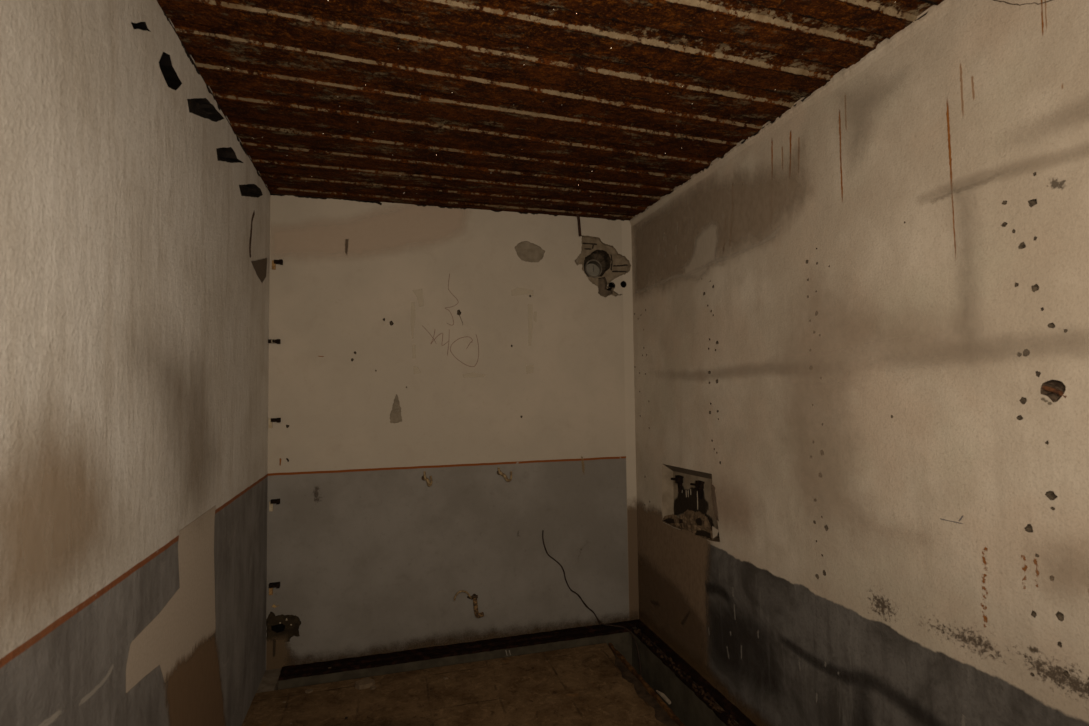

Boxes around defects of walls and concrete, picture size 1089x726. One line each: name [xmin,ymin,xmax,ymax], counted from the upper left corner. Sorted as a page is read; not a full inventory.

crack [993,0,1052,8]
rust [161,8,330,200]
rust [946,103,956,255]
flaking render [515,241,545,263]
flaking render [575,235,631,297]
flaking render [390,394,402,423]
flaking render [1040,380,1067,405]
damp [866,586,897,621]
flaking render [266,605,301,657]
damp [919,616,1004,662]
damp [1020,645,1089,701]